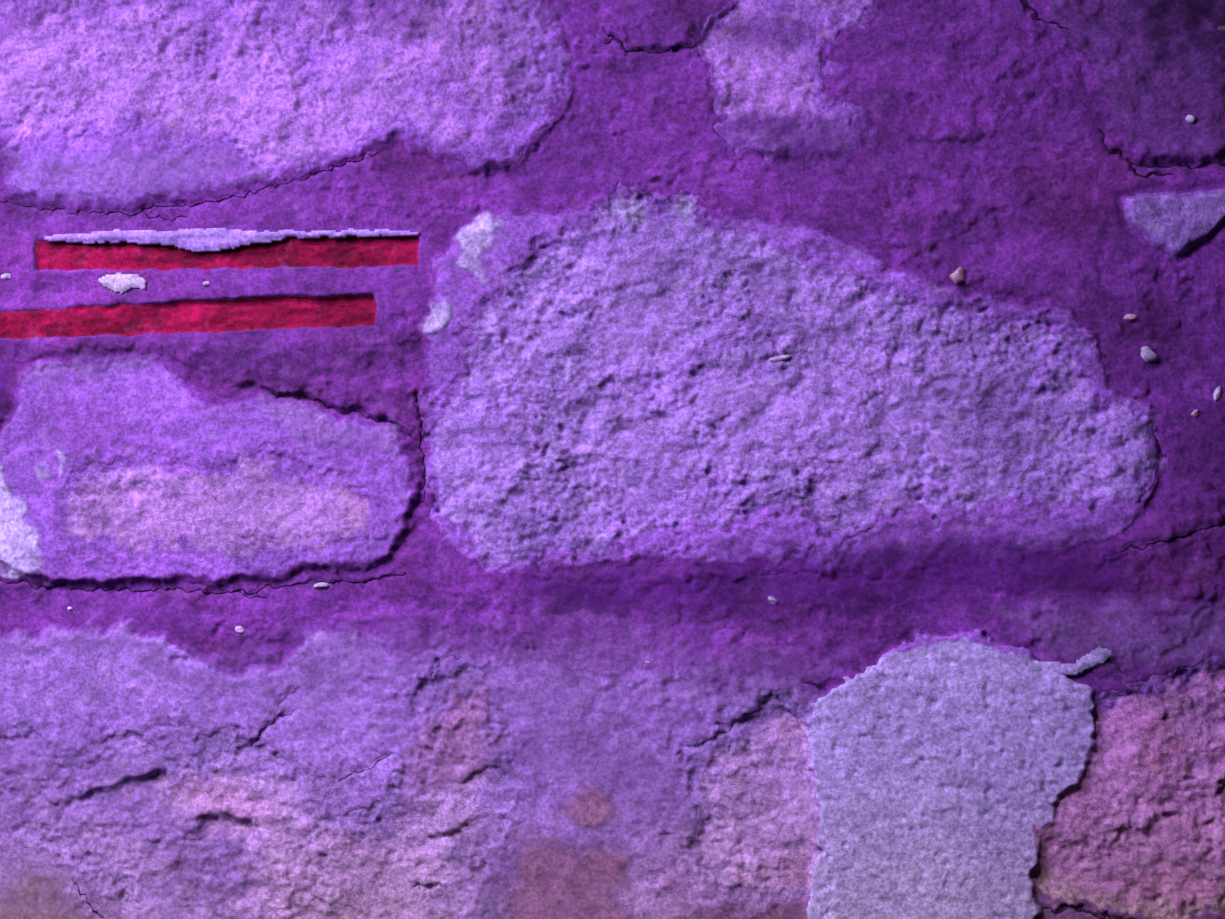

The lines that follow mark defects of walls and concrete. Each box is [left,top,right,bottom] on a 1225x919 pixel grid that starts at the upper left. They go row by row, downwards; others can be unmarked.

crack [603,31,695,54]
spalling [697,0,876,163]
crack [266,388,426,503]
peeling [1029,646,1112,676]
crack [235,686,299,761]
crack [338,721,442,782]